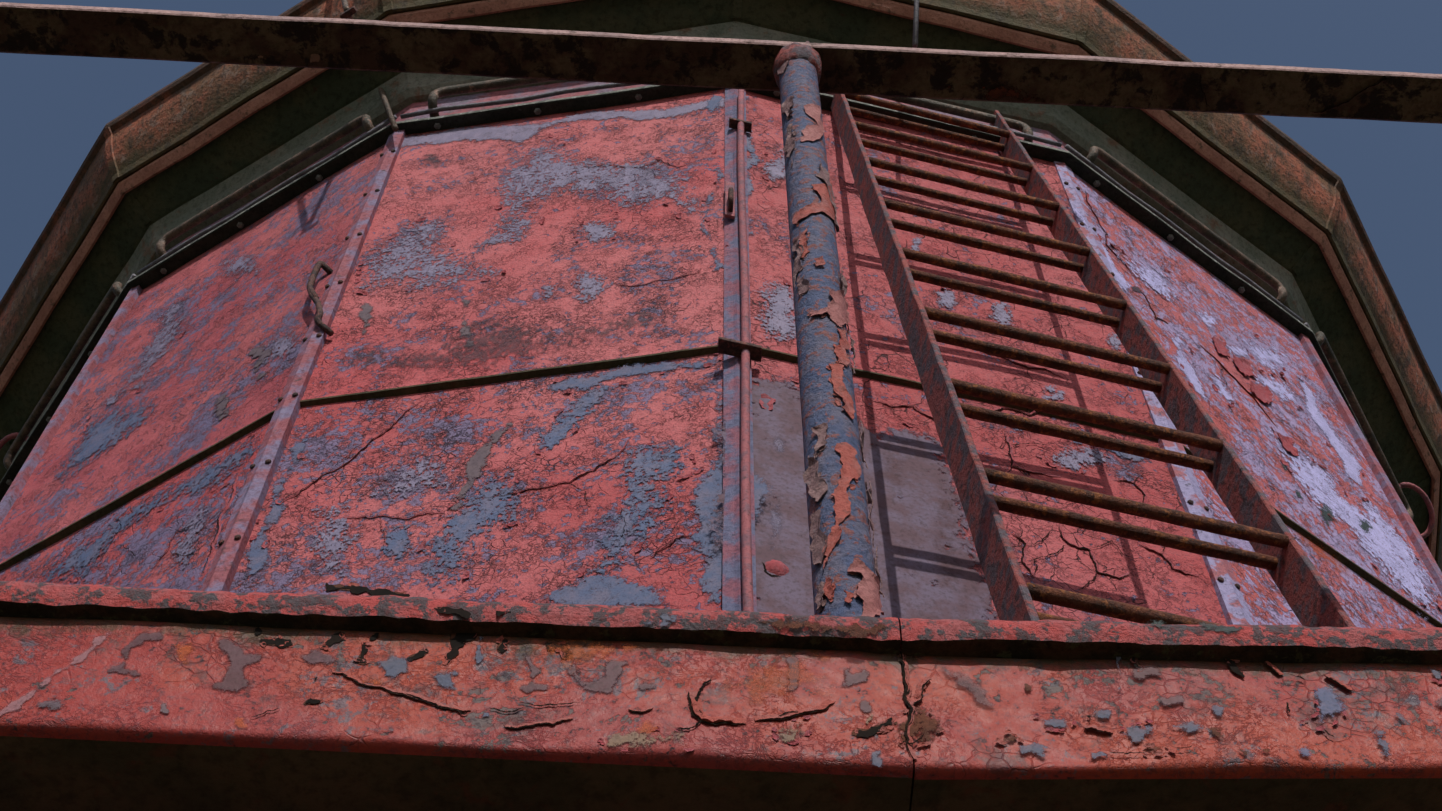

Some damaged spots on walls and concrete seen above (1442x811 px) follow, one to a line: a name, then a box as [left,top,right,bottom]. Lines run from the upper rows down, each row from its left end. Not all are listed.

peeling [353,95,825,296]
peeling [1067,184,1180,304]
crack [283,400,423,501]
peeling [305,451,525,612]
peeling [533,353,726,626]
peeling [752,163,998,620]
peeling [1035,441,1144,473]
crack [1012,472,1199,590]
peeling [1169,308,1442,619]
peeling [212,633,409,692]
crack [628,679,836,730]
crack [899,650,931,759]